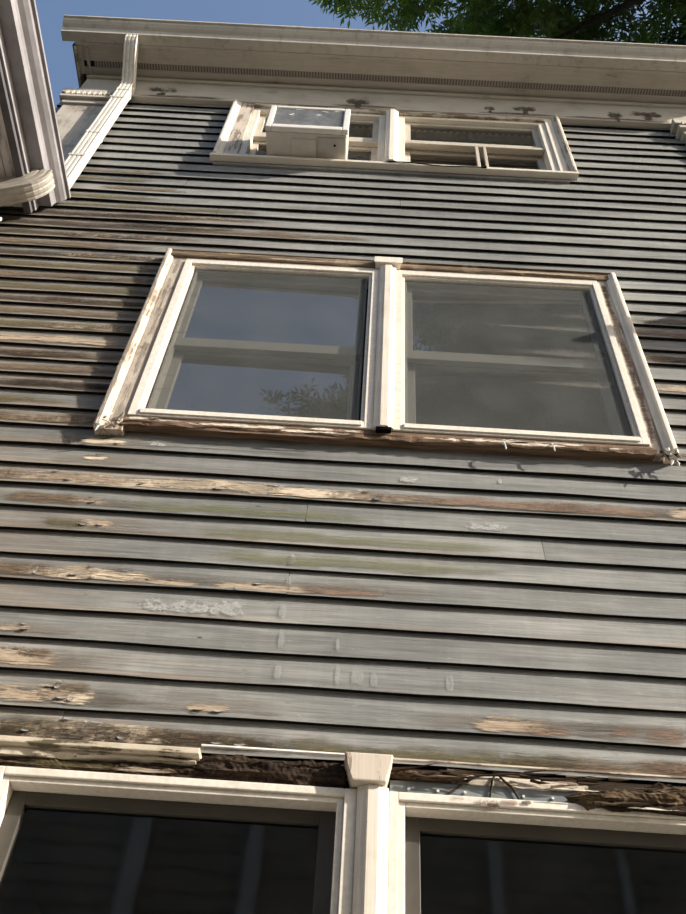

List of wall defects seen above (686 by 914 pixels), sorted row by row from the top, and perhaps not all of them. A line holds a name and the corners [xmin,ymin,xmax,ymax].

peeling [98,252,359,417]
peeling [114,388,360,438]
peeling [0,436,686,519]
peeling [470,523,506,531]
peeling [0,561,425,596]
peeling [145,600,242,616]
peeling [0,646,97,668]
peeling [0,680,136,706]
peeling [156,693,271,715]
peeling [21,760,170,773]
peeling [0,715,276,752]
leakage [0,720,686,778]